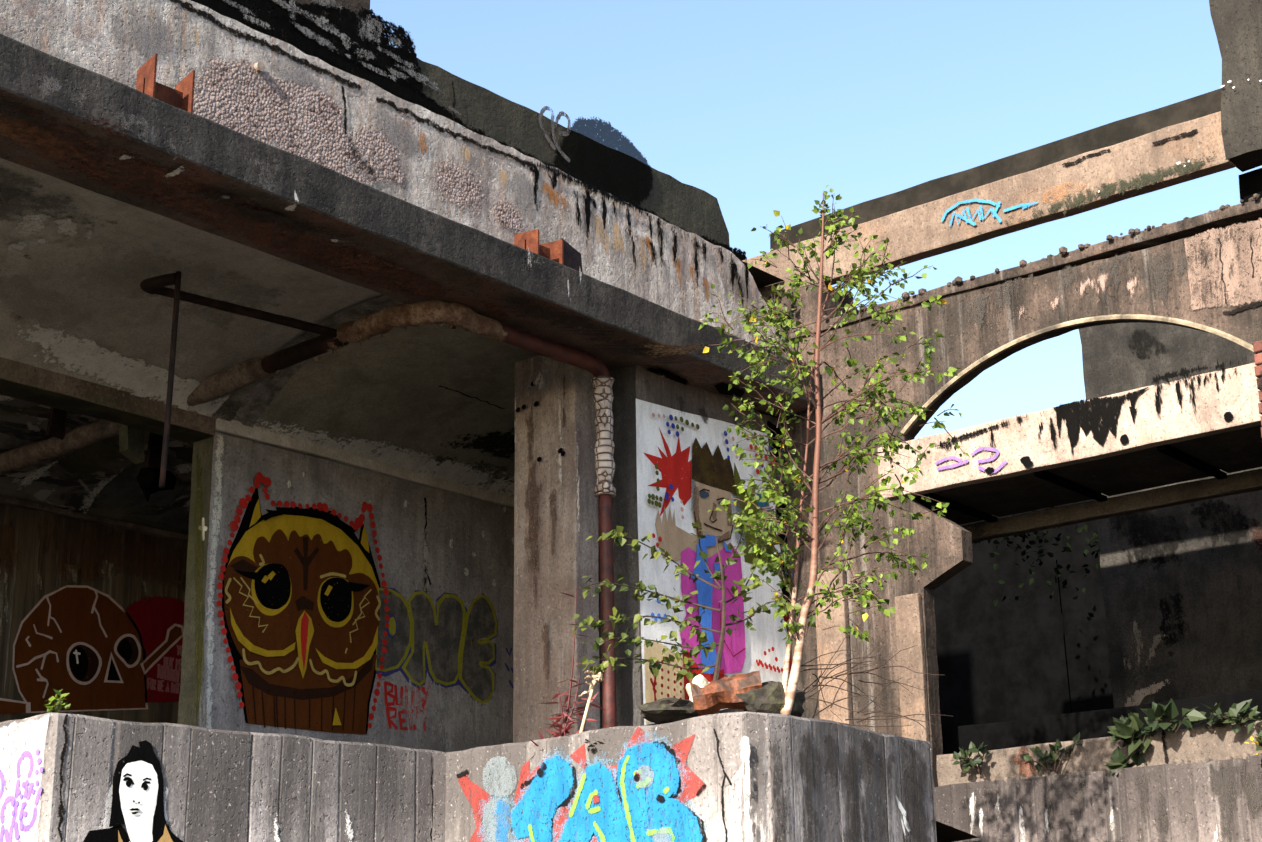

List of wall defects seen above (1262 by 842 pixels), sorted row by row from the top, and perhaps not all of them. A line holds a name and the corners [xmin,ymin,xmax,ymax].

water stain [513,162,749,310]
water stain [435,367,580,609]
water stain [542,623,550,679]
crack [713,729,732,842]
water stain [970,792,999,835]
water stain [1136,773,1168,833]
water stain [1210,761,1262,842]